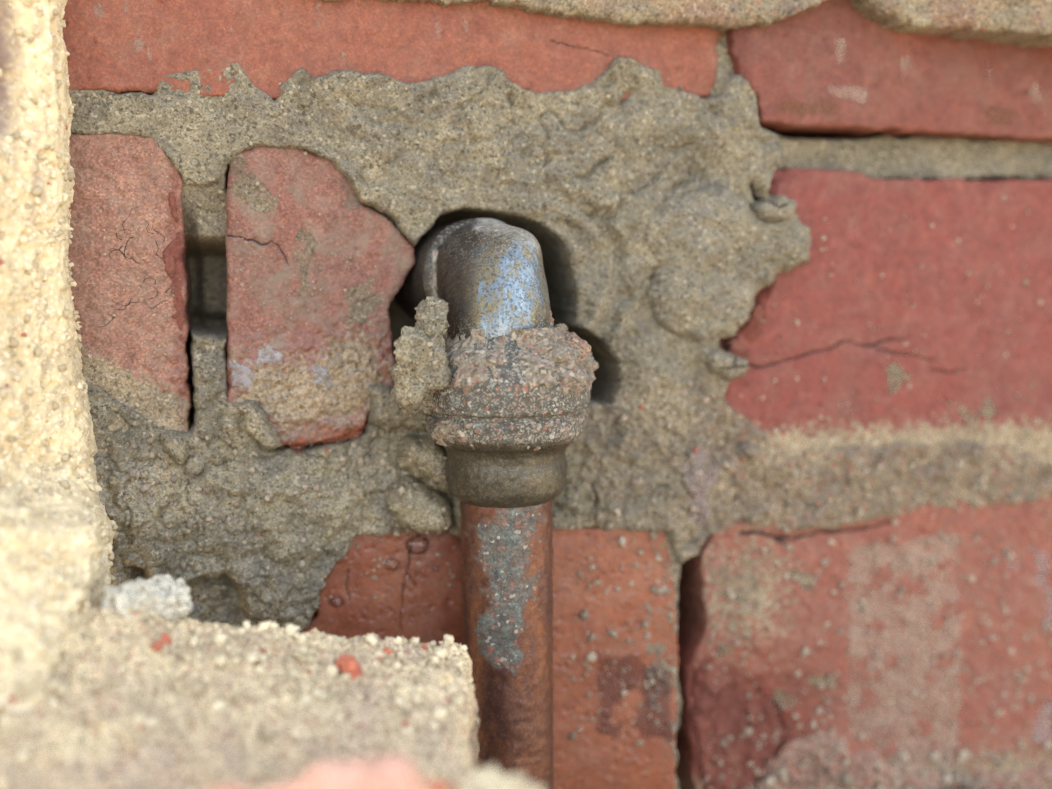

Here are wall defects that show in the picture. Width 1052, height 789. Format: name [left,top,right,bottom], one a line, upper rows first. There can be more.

crack [749,184,789,208]
crack [227,235,289,266]
crack [100,213,173,327]
crack [719,338,967,373]